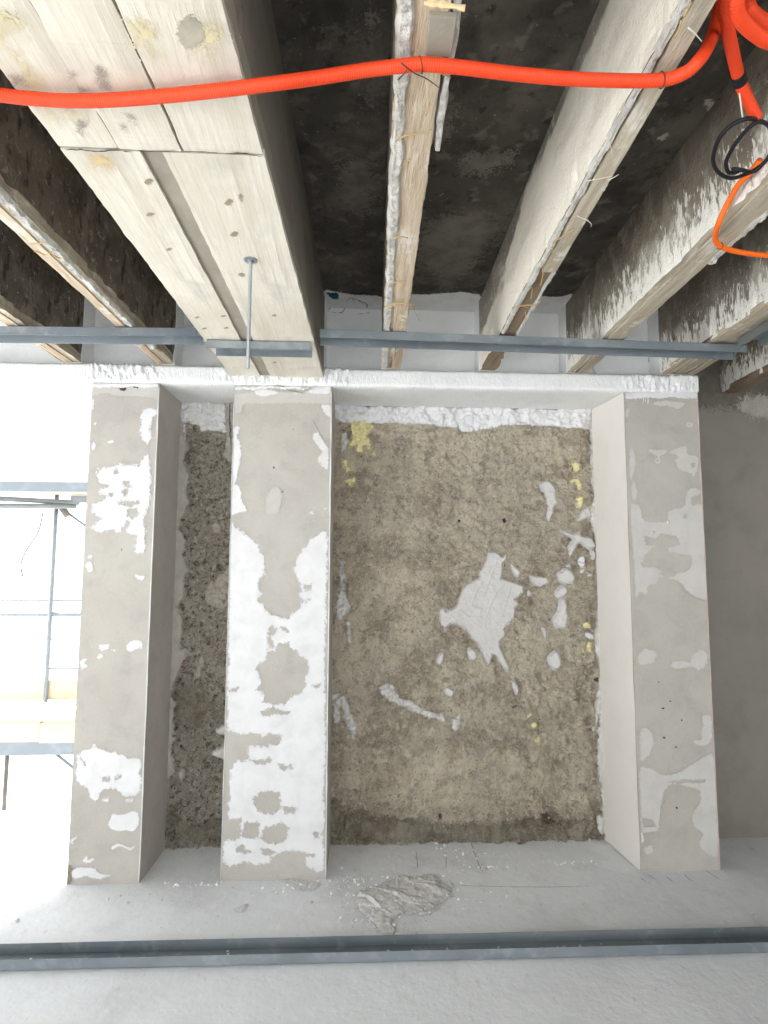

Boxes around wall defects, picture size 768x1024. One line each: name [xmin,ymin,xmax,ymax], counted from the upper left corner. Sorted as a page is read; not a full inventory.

flaking render [79,644,116,673]